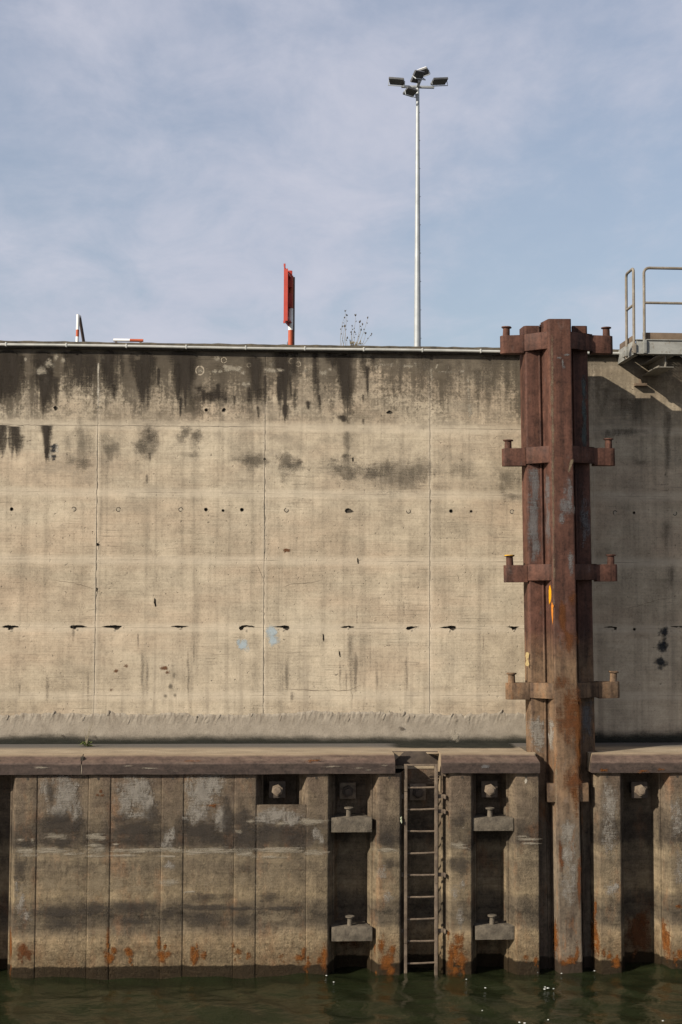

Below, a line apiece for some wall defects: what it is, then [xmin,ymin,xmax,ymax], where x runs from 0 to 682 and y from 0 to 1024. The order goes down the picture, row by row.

leakage [0,350,160,409]
leakage [170,351,235,415]
leakage [248,352,375,418]
leakage [0,425,23,453]
leakage [41,425,58,459]
corrosion [10,928,32,962]
corrosion [104,933,133,965]
corrosion [446,931,466,975]
corrosion [590,902,620,968]
corrosion [662,921,682,967]